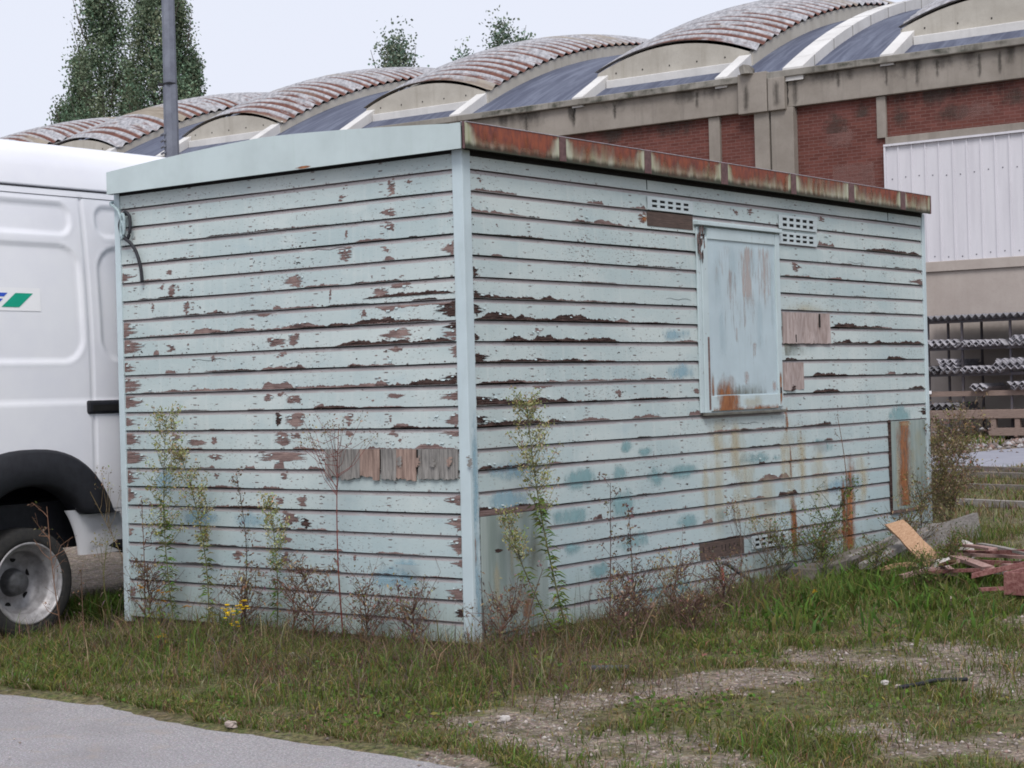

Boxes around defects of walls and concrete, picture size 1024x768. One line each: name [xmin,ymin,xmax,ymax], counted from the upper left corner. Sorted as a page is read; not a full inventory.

corrosion [470,123,928,204]
peeling [337,178,412,263]
peeling [573,203,693,242]
peeling [122,214,459,572]
peeling [477,376,684,464]
peeling [659,318,712,425]
corrosion [712,374,788,431]
peeling [774,305,839,441]
corrosion [899,421,910,506]
peeling [426,489,463,622]
peeling [582,472,775,582]
corrosion [833,467,855,549]